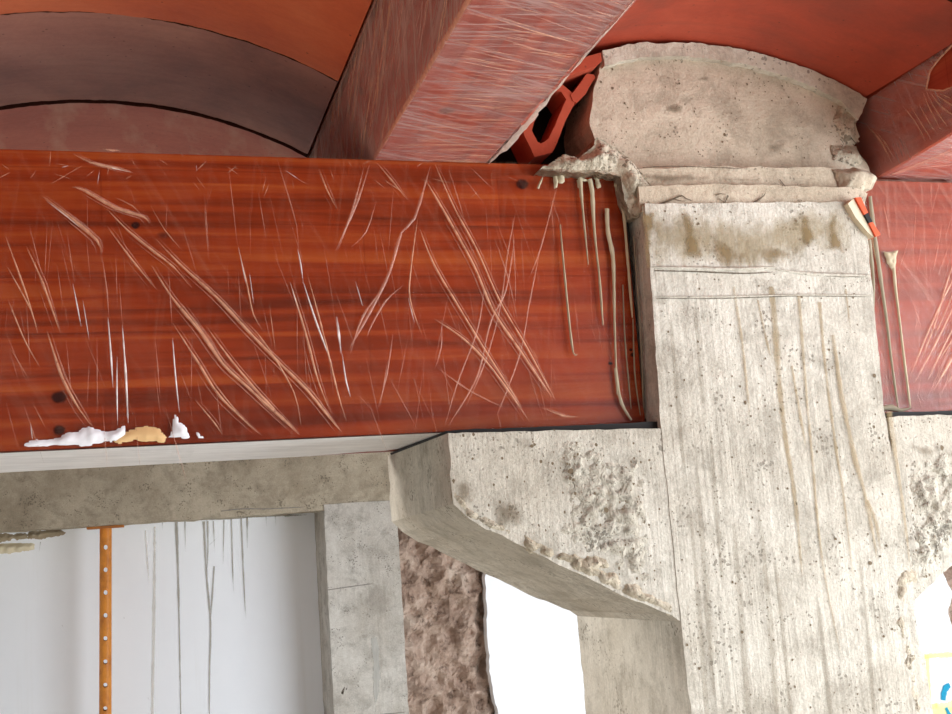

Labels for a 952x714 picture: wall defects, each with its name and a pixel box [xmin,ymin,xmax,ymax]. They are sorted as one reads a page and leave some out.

damp [666,217,841,265]
peeling [114,426,167,444]
flaking render [0,530,66,554]
spalling [521,441,672,615]